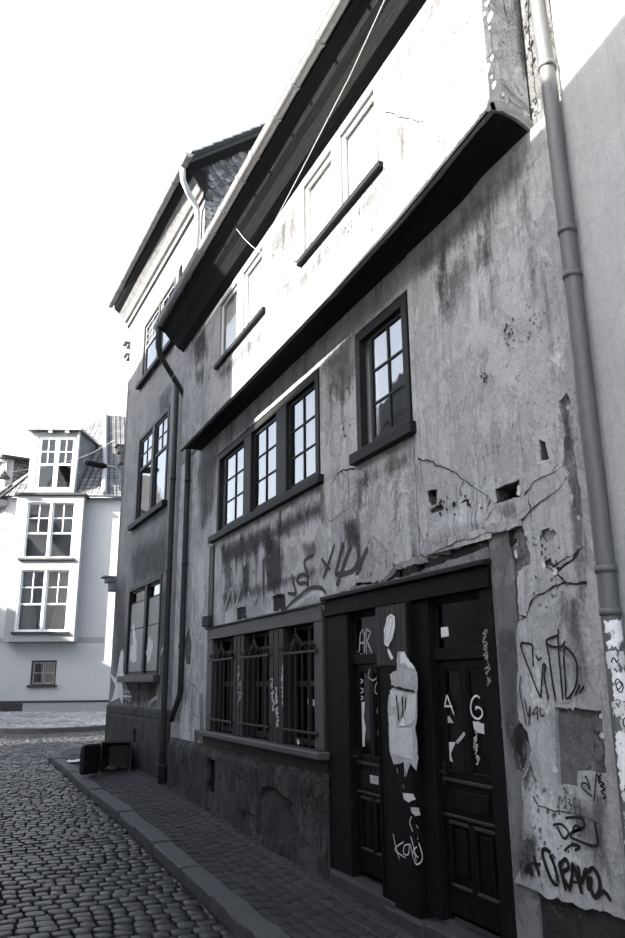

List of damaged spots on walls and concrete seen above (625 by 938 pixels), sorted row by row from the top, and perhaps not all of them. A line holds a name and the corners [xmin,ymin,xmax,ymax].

crack [445,0,524,109]
leakage [514,0,527,77]
crack [394,458,496,529]
flaking render [429,495,482,522]
crack [521,463,570,521]
leakage [222,504,320,603]
leakage [284,585,326,610]
flaking render [513,526,580,609]
crack [515,547,587,622]